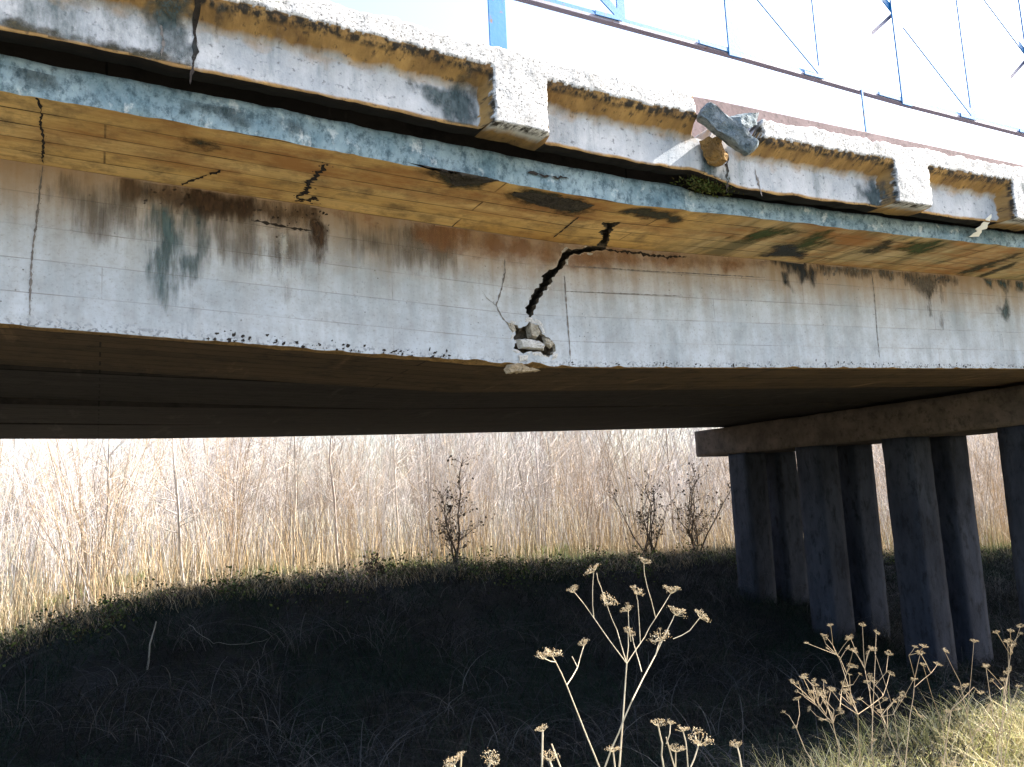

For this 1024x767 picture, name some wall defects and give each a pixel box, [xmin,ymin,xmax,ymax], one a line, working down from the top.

crack [189,0,201,84]
damp [422,81,477,125]
spalling [696,102,759,167]
crack [28,98,47,314]
damp [81,178,320,296]
crack [182,170,221,185]
crack [251,219,311,231]
crack [293,162,328,204]
corrosion [310,221,327,258]
crack [482,217,765,361]
damp [905,253,1024,319]
spalling [503,317,558,374]